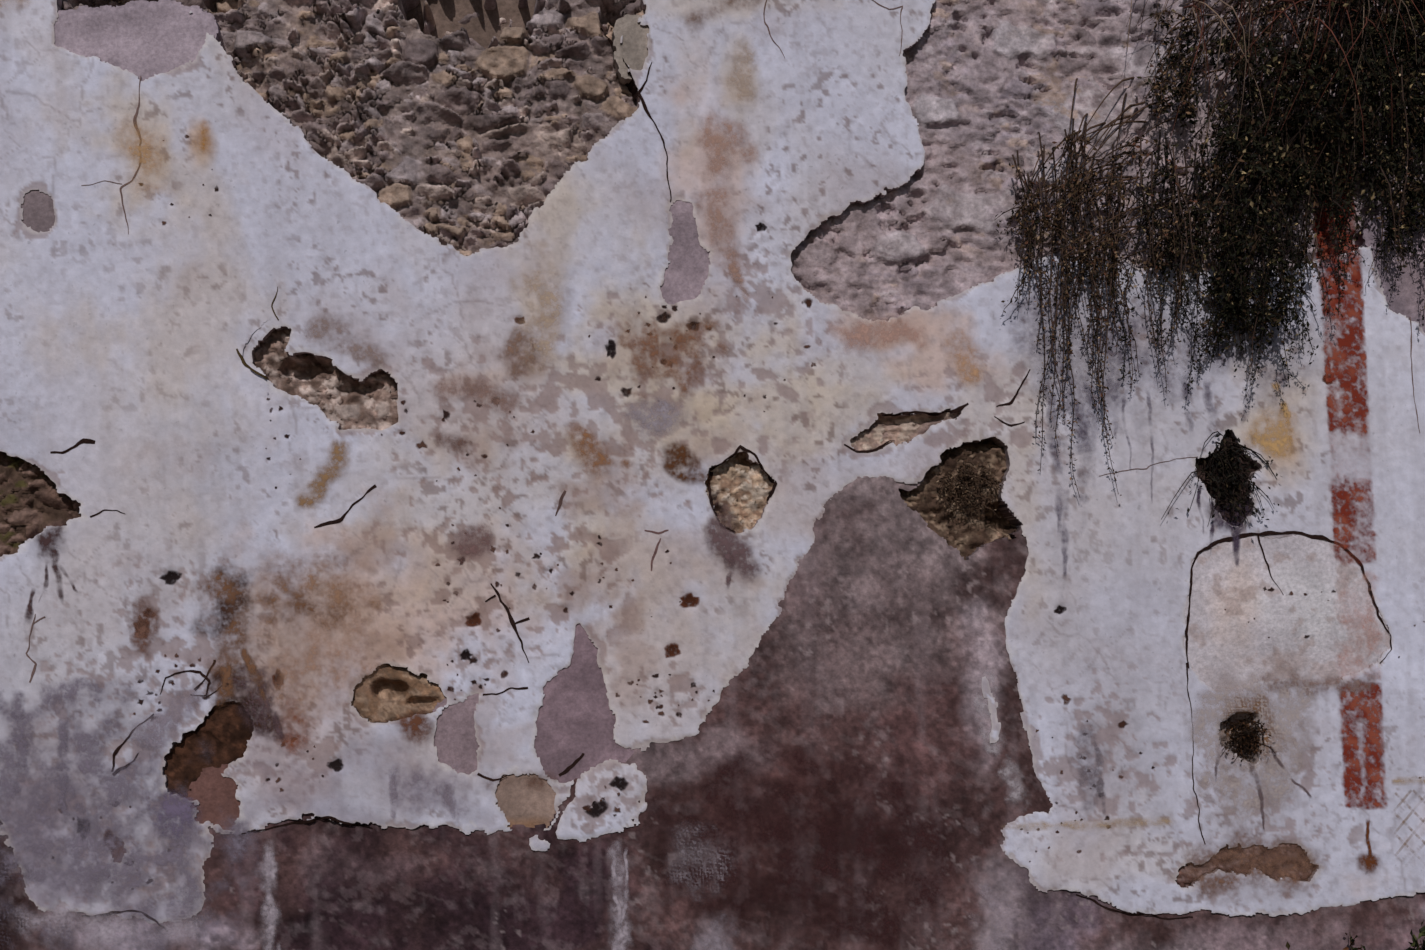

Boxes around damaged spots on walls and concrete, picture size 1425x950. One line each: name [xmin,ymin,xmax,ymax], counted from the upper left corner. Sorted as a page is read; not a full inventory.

spalling [54,0,649,256]
spalling [791,0,1425,333]
spalling [253,329,427,460]
spalling [850,409,960,453]
damp [44,680,102,705]
damp [132,604,158,652]
damp [204,569,283,738]
peeling [0,430,1425,950]
crack [1185,531,1392,844]
damp [0,693,204,950]
damp [262,848,280,950]
damp [610,842,630,950]